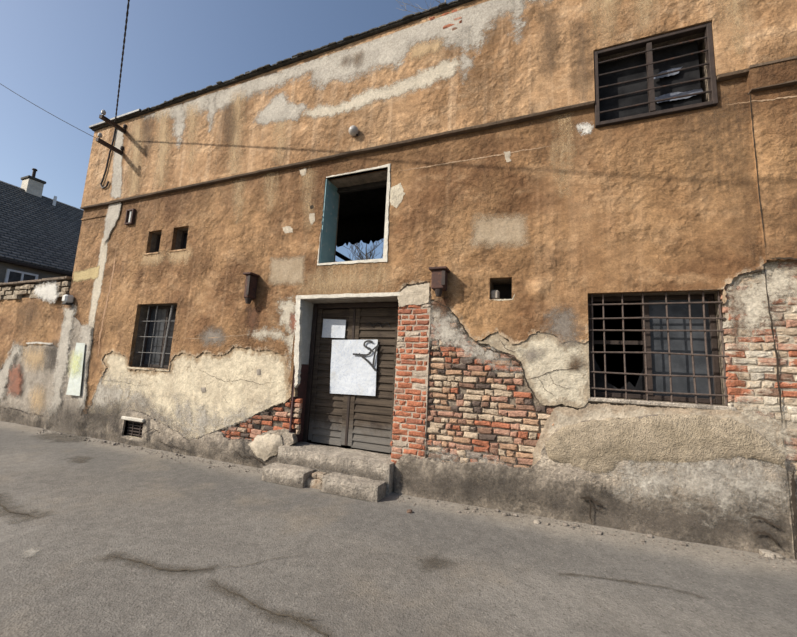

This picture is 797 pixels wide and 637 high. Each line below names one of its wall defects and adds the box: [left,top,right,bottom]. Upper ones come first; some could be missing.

flaking render [142,0,537,148]
flaking render [389,183,405,208]
crack [728,90,797,446]
flaking render [0,342,44,399]
water stain [0,374,252,459]
flaking render [88,299,303,441]
water stain [224,452,304,466]
water stain [314,458,795,552]
flaking render [390,262,797,475]
crack [789,469,797,553]